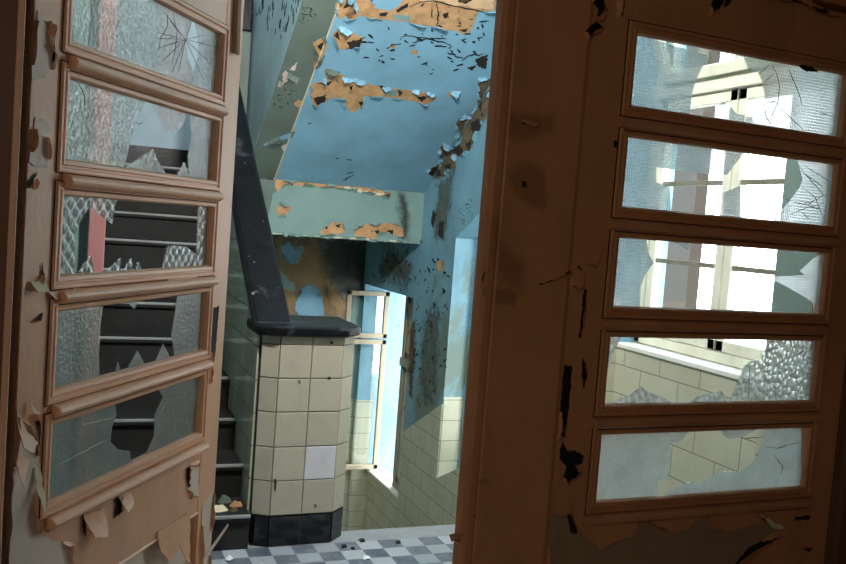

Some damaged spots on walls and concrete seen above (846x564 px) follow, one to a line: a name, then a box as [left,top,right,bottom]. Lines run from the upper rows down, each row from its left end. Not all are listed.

flaking render [277,63,301,88]
peeling [294,0,497,112]
peeling [263,131,295,151]
peeling [272,221,412,284]
peeling [280,271,325,316]